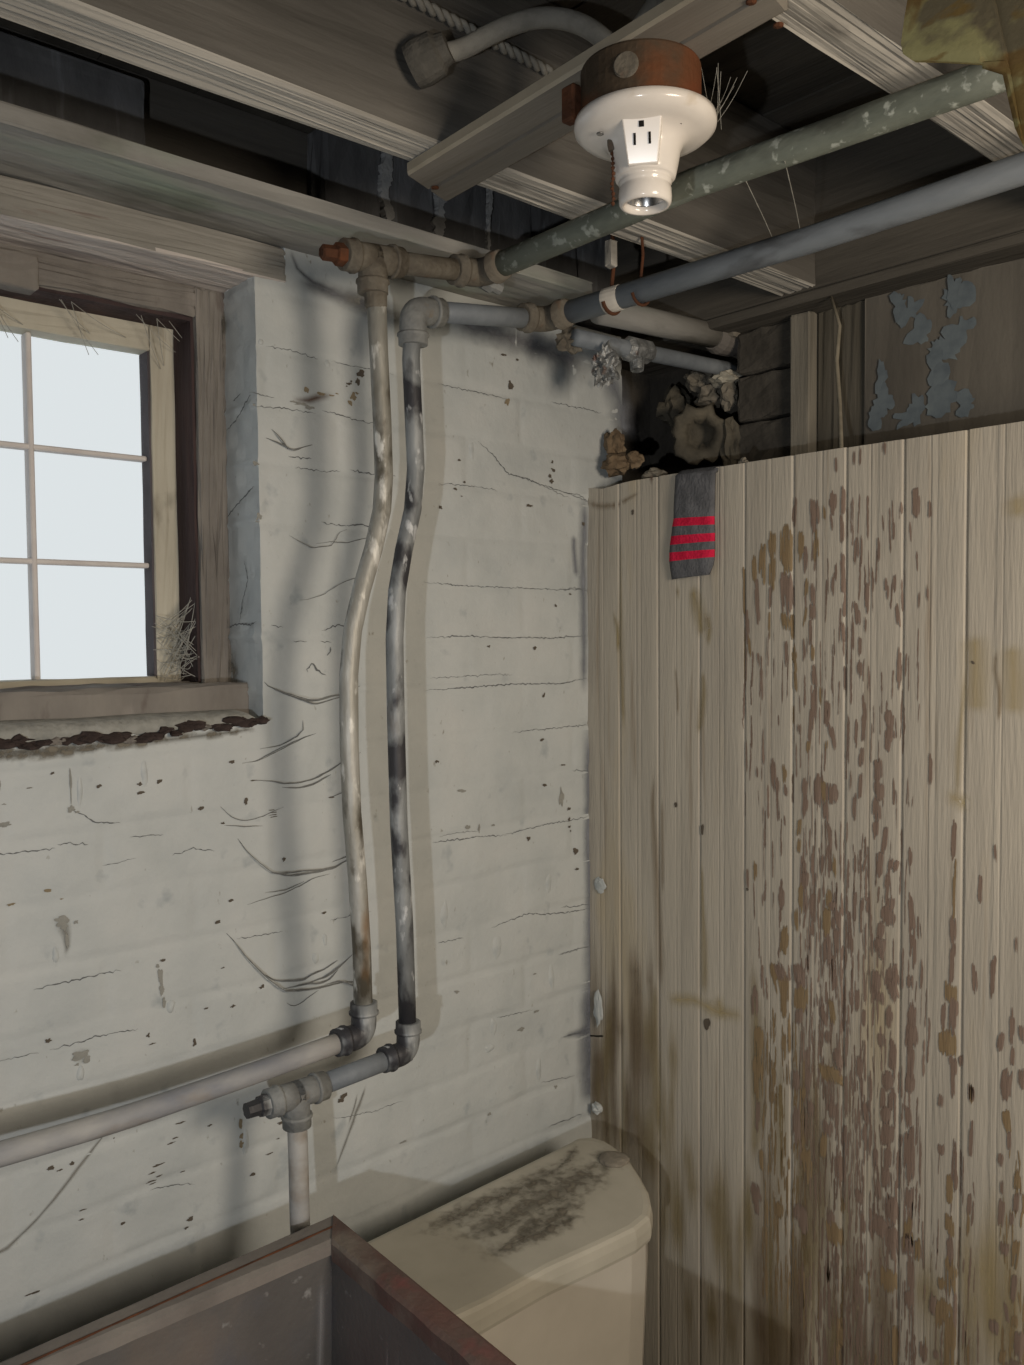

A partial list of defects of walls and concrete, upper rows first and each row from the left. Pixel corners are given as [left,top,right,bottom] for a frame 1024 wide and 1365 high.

peeling [868,274,976,454]
spalling [0,716,270,750]
peeling [742,457,1024,1365]